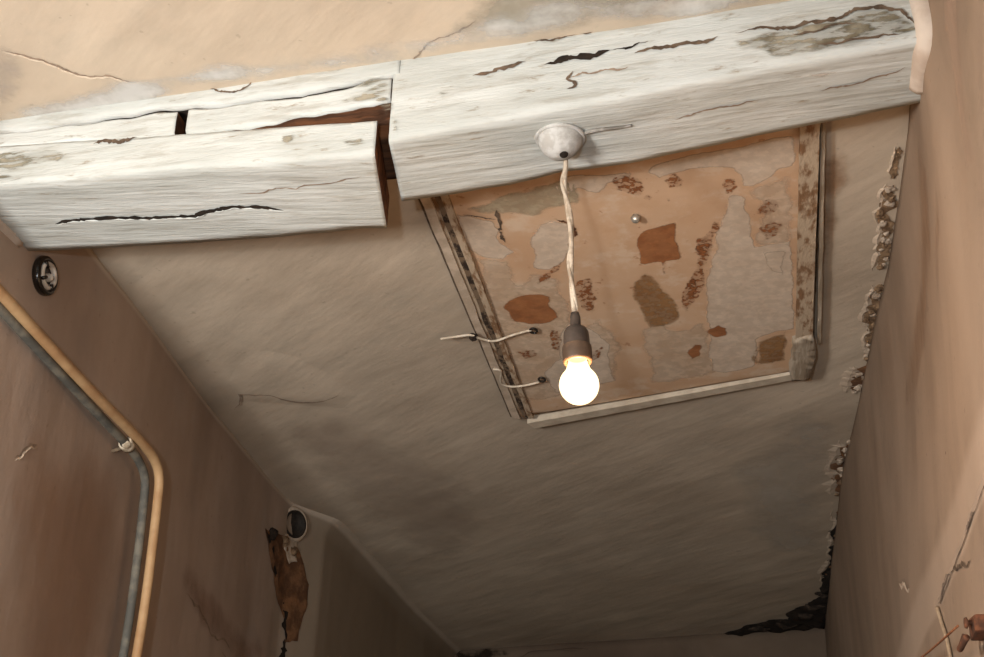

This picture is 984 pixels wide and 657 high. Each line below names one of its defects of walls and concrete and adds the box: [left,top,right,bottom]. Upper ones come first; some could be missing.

leakage [484,0,655,30]
peeling [459,173,630,399]
peeling [643,136,795,382]
spalling [839,284,884,394]
spalling [871,146,903,271]
spalling [821,439,850,496]
spalling [724,511,838,636]
crack [938,475,984,603]
crack [279,639,287,657]